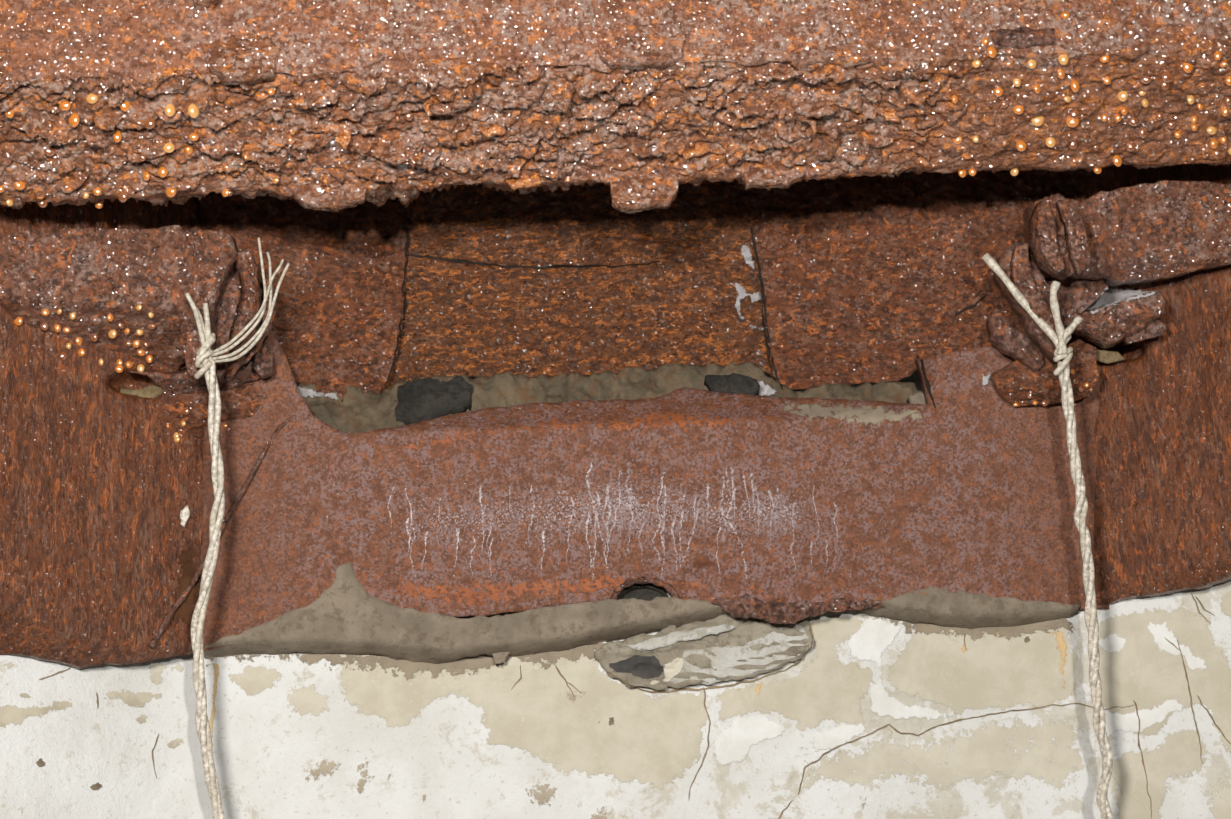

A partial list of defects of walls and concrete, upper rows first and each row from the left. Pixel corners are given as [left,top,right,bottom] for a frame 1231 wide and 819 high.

rust [990,26,1055,50]
rust [288,183,367,212]
rust [504,175,541,190]
rust [609,173,679,213]
rust [741,164,807,190]
crack [751,227,783,389]
spalling [395,376,474,425]
spalling [704,373,760,395]
damp [388,459,838,582]
peeling [228,593,1088,792]
peeling [1098,591,1231,819]
crack [778,700,1152,819]